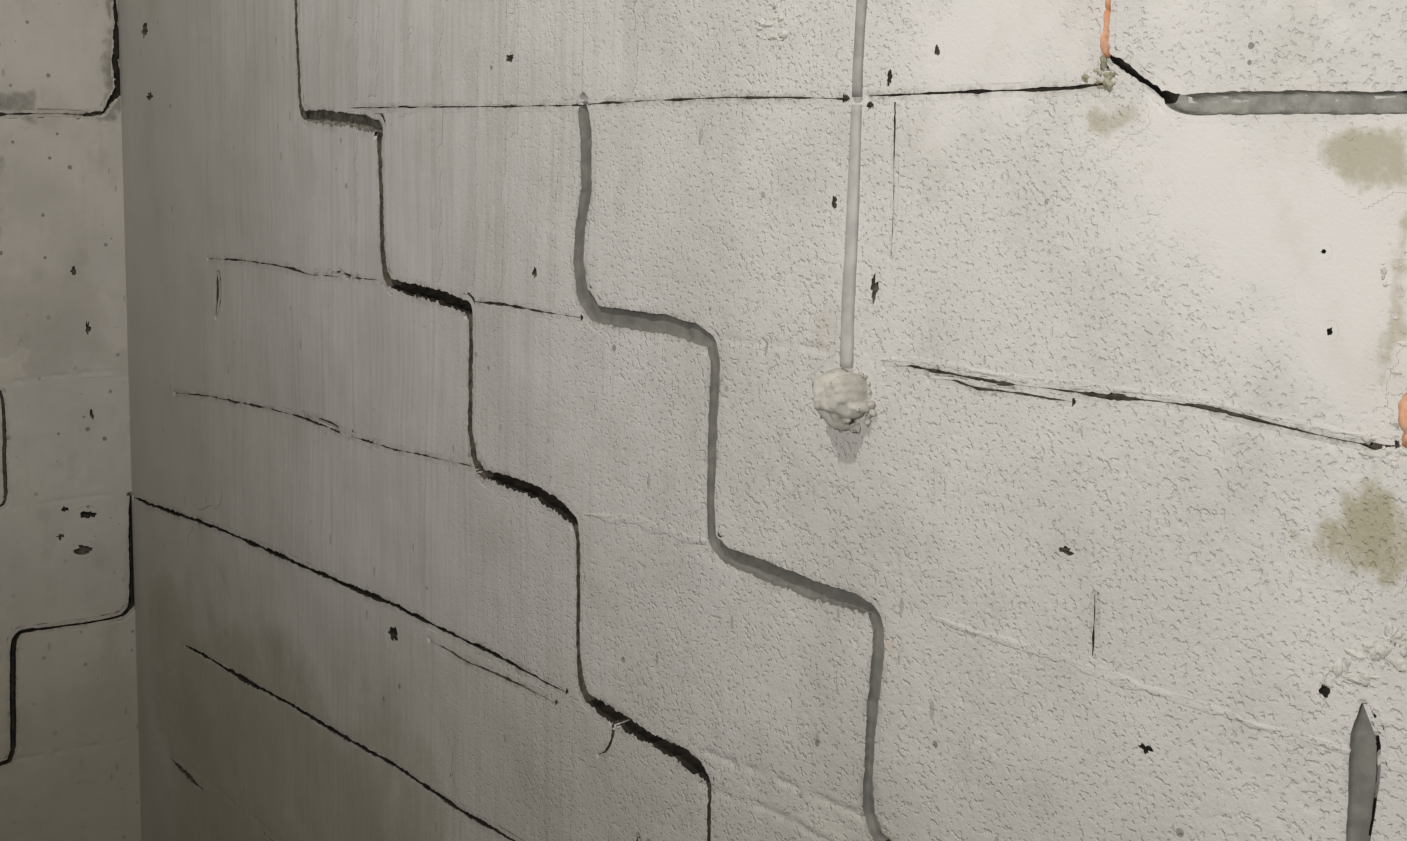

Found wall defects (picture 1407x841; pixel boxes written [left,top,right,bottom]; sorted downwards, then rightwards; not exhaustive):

crack [868,0,1407,256]
crack [0,0,899,841]
crack [885,360,1407,456]
crack [1339,703,1387,841]